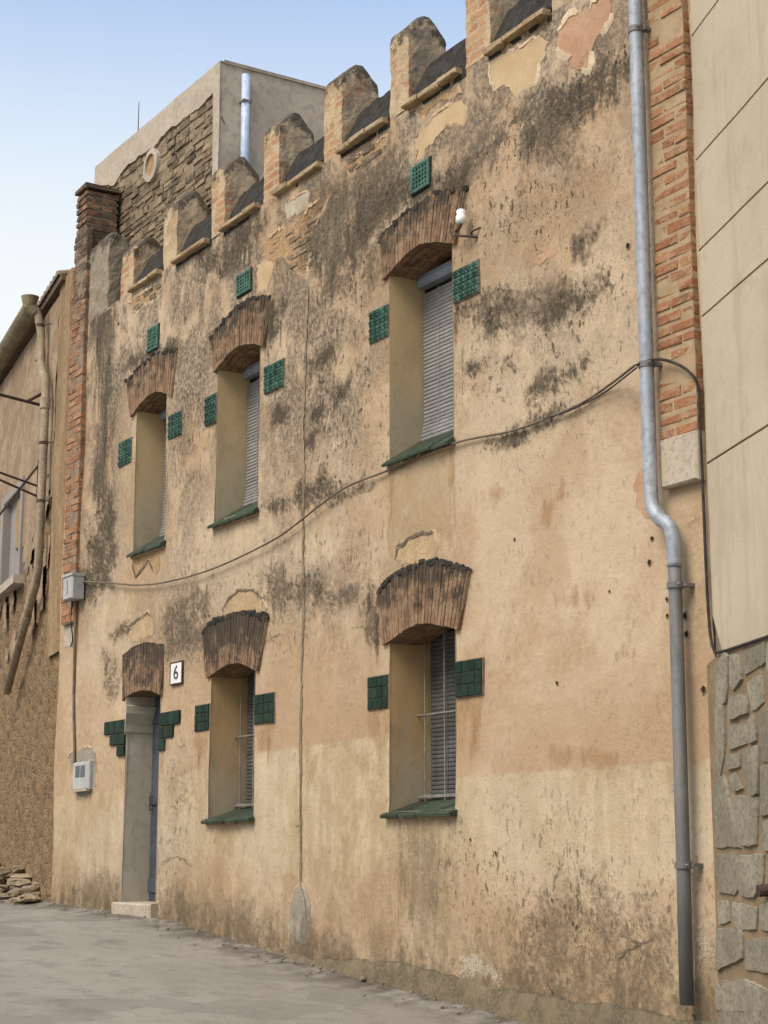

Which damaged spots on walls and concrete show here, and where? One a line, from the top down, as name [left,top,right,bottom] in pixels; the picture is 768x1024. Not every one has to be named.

peeling [487,0,614,99]
spalling [415,82,468,163]
water stain [296,44,630,304]
spalling [256,190,332,296]
water stain [454,267,610,338]
water stain [79,276,178,606]
water stain [485,356,588,452]
spalling [394,529,439,566]
spalling [127,609,154,643]
spalling [222,588,268,614]
water stain [455,953,564,1001]